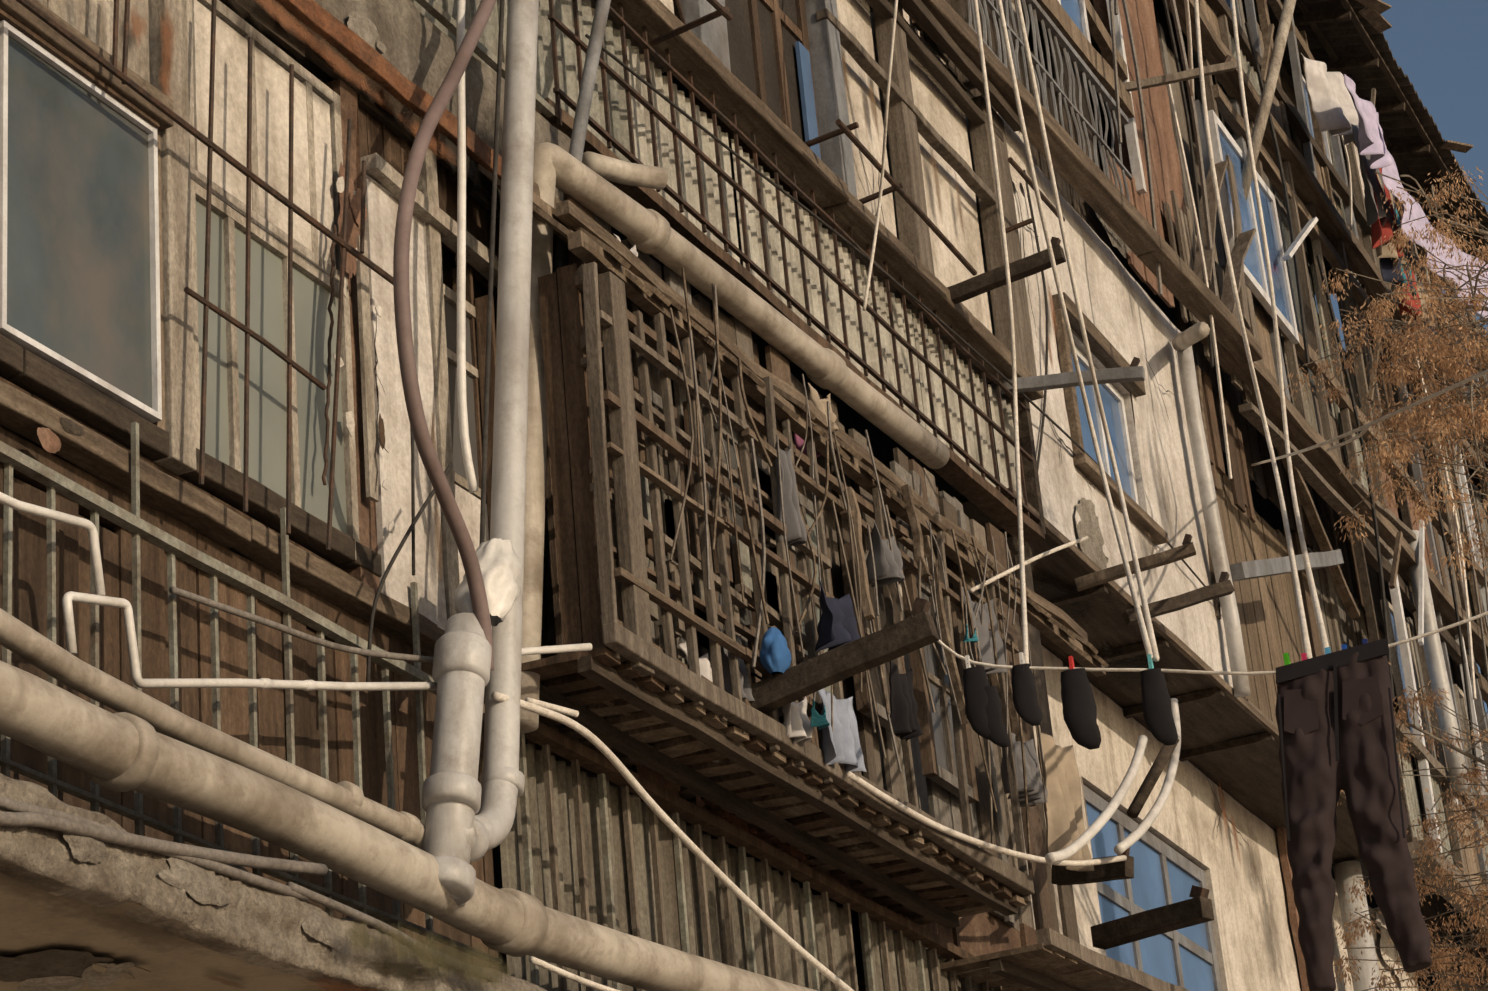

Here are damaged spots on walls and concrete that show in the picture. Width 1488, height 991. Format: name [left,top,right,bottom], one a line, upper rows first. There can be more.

rust [260,0,367,90]
spalling [0,773,547,991]